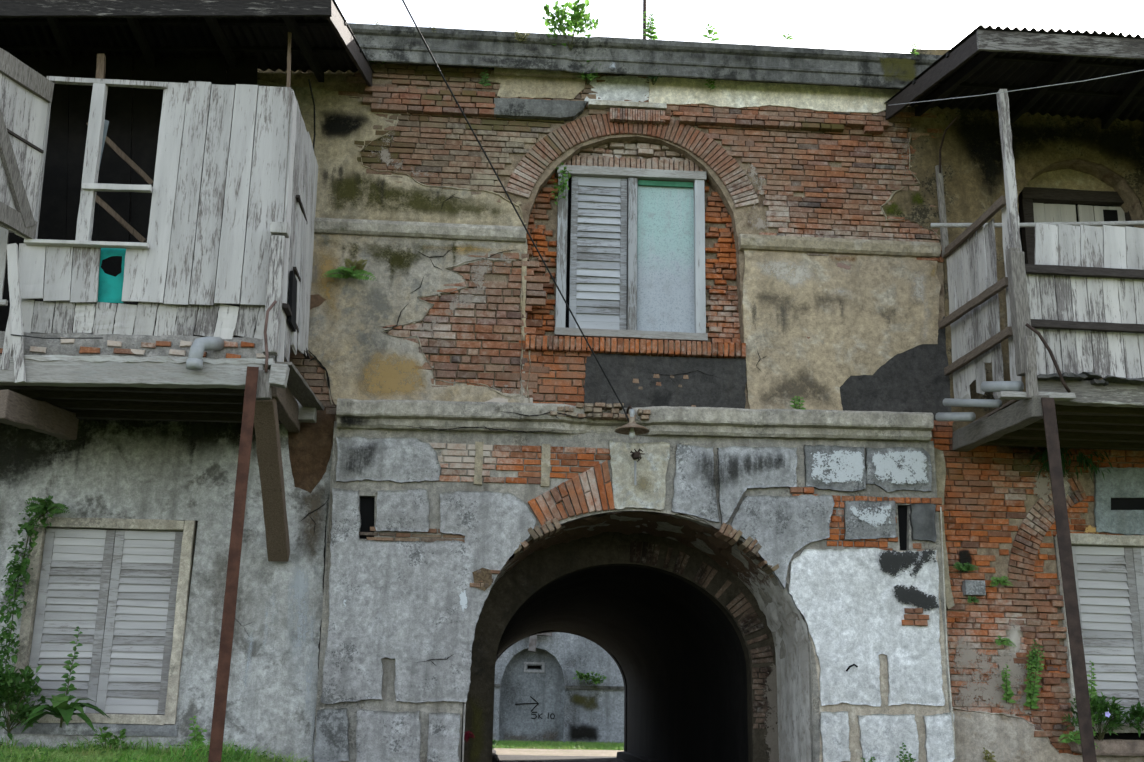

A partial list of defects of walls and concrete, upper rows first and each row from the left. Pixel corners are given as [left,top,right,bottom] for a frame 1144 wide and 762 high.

flaking render [338,62,944,263]
flaking render [284,343,337,494]
flaking render [381,252,651,421]
flaking render [427,442,615,610]
flaking render [790,316,1144,755]